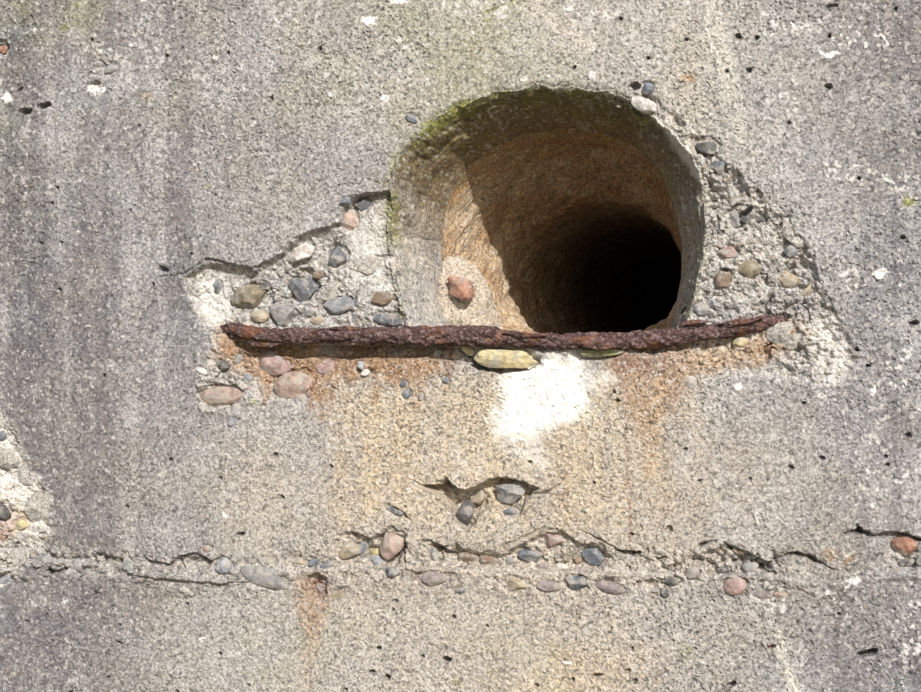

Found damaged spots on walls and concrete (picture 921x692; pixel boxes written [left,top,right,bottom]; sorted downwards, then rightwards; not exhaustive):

crack [160,258,273,278]
spalling [181,190,406,415]
spalling [628,81,871,389]
spalling [403,344,463,358]
water stain [511,347,550,360]
water stain [318,352,705,564]
corrosion [213,314,815,547]
spalling [425,475,541,532]
crack [0,523,921,610]
spalling [425,529,615,571]